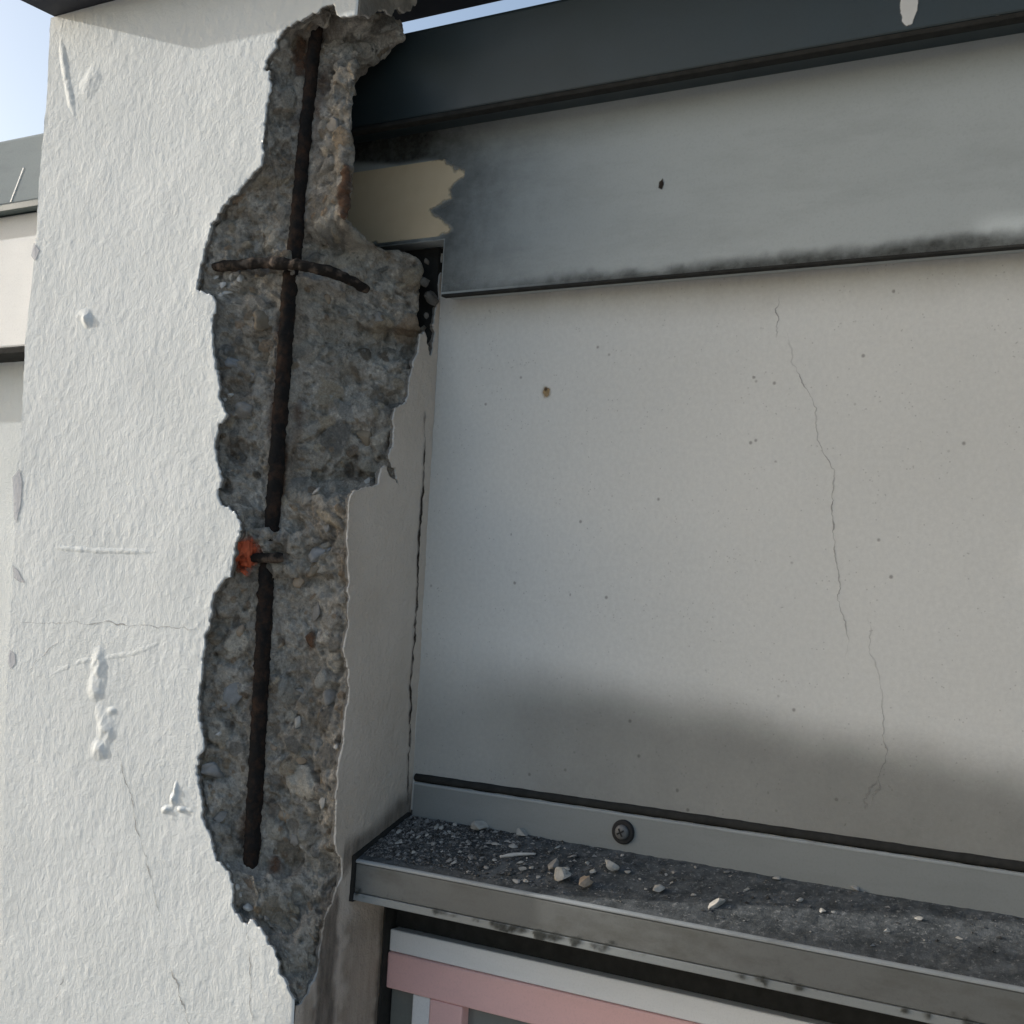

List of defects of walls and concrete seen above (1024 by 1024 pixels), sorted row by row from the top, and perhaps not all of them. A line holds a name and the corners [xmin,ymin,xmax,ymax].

rust [337,164,351,220]
spalling [161,3,465,1008]
rust [235,538,258,576]
rust [305,632,315,648]